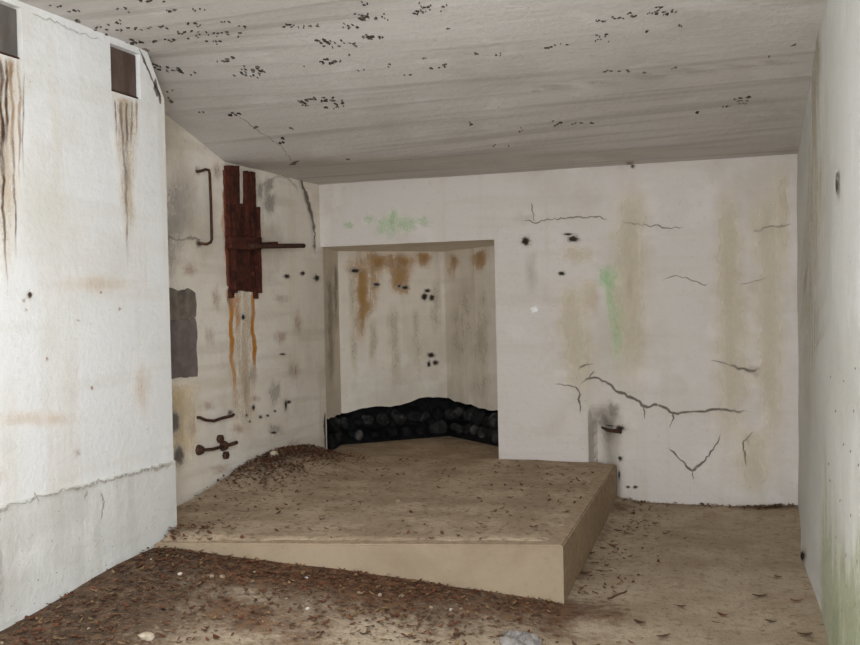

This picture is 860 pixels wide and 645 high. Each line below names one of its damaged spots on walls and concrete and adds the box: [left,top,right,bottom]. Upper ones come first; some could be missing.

crack [526,206,603,224]
rust [227,288,257,414]
crack [561,364,742,425]
crack [670,438,720,479]
crack [0,464,167,518]